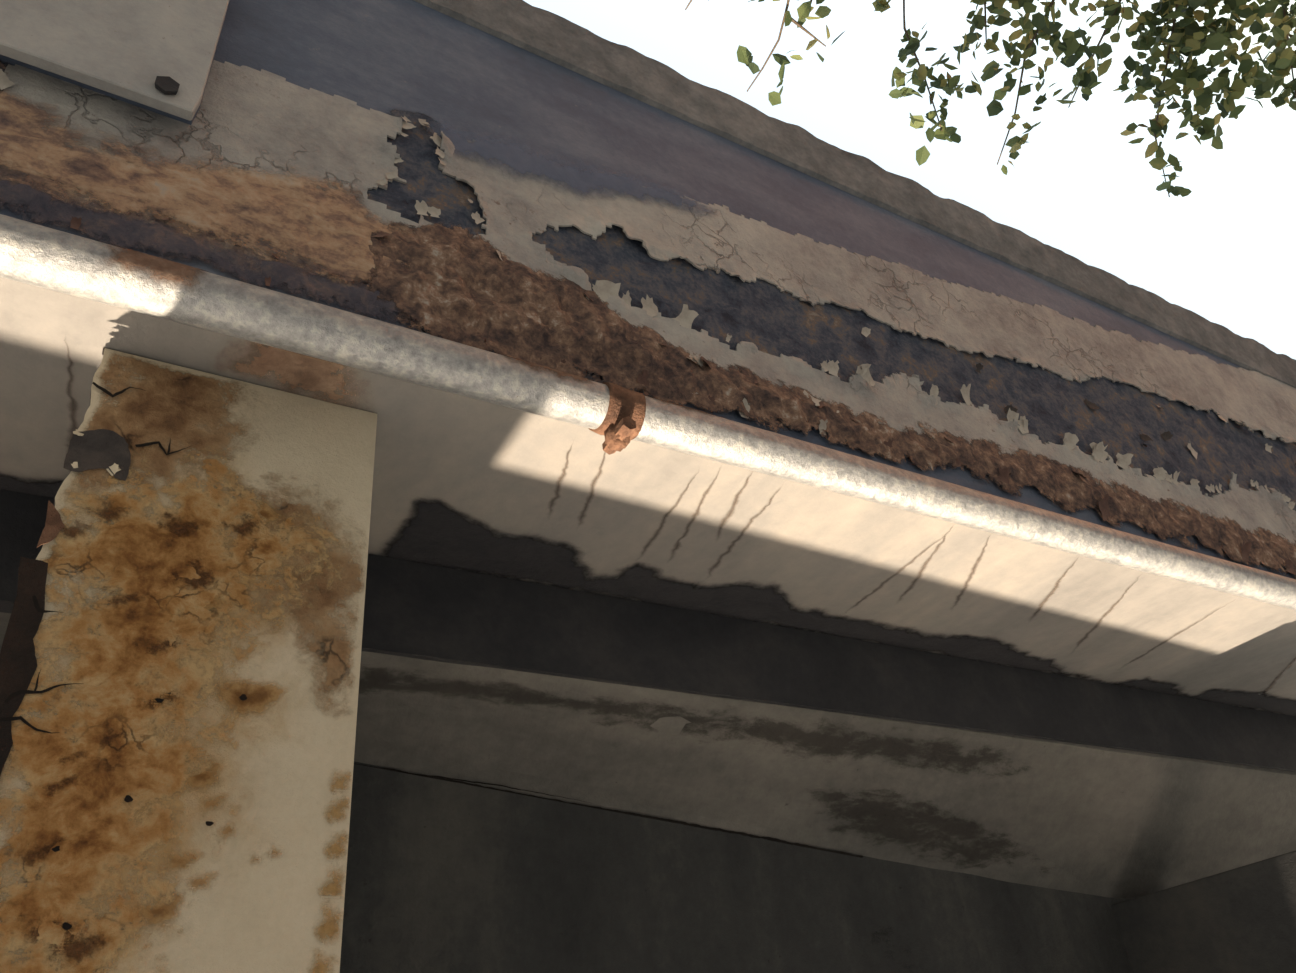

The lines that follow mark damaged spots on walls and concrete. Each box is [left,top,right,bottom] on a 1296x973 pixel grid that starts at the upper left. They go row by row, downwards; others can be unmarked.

peeling [367,110,709,239]
rust [0,91,1296,578]
peeling [532,225,1296,511]
peeling [63,429,131,481]
rust [0,342,363,973]
damp [359,668,1009,775]
damp [824,793,1016,867]